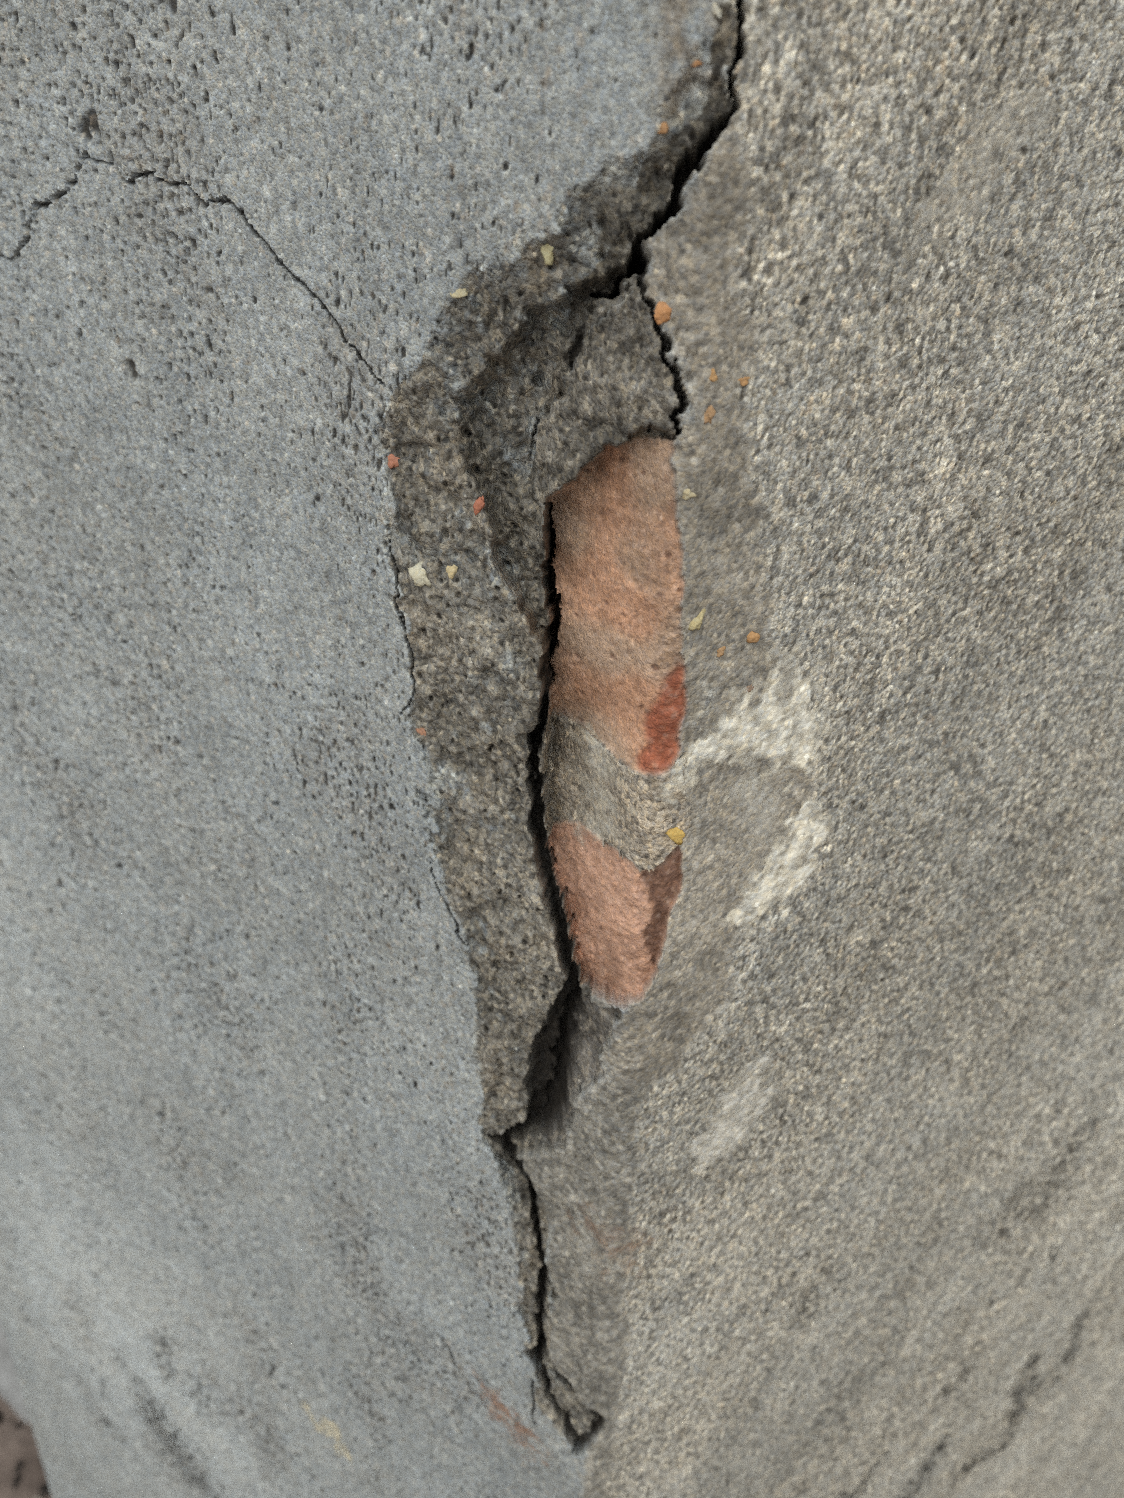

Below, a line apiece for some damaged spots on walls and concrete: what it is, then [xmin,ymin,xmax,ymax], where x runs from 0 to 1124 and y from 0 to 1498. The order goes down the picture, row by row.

crack [0,149,386,388]
crack [567,0,747,439]
crack [388,538,416,716]
spalling [375,1,829,1444]
crack [429,856,470,949]
crack [486,501,606,1457]
crack [442,1337,489,1411]